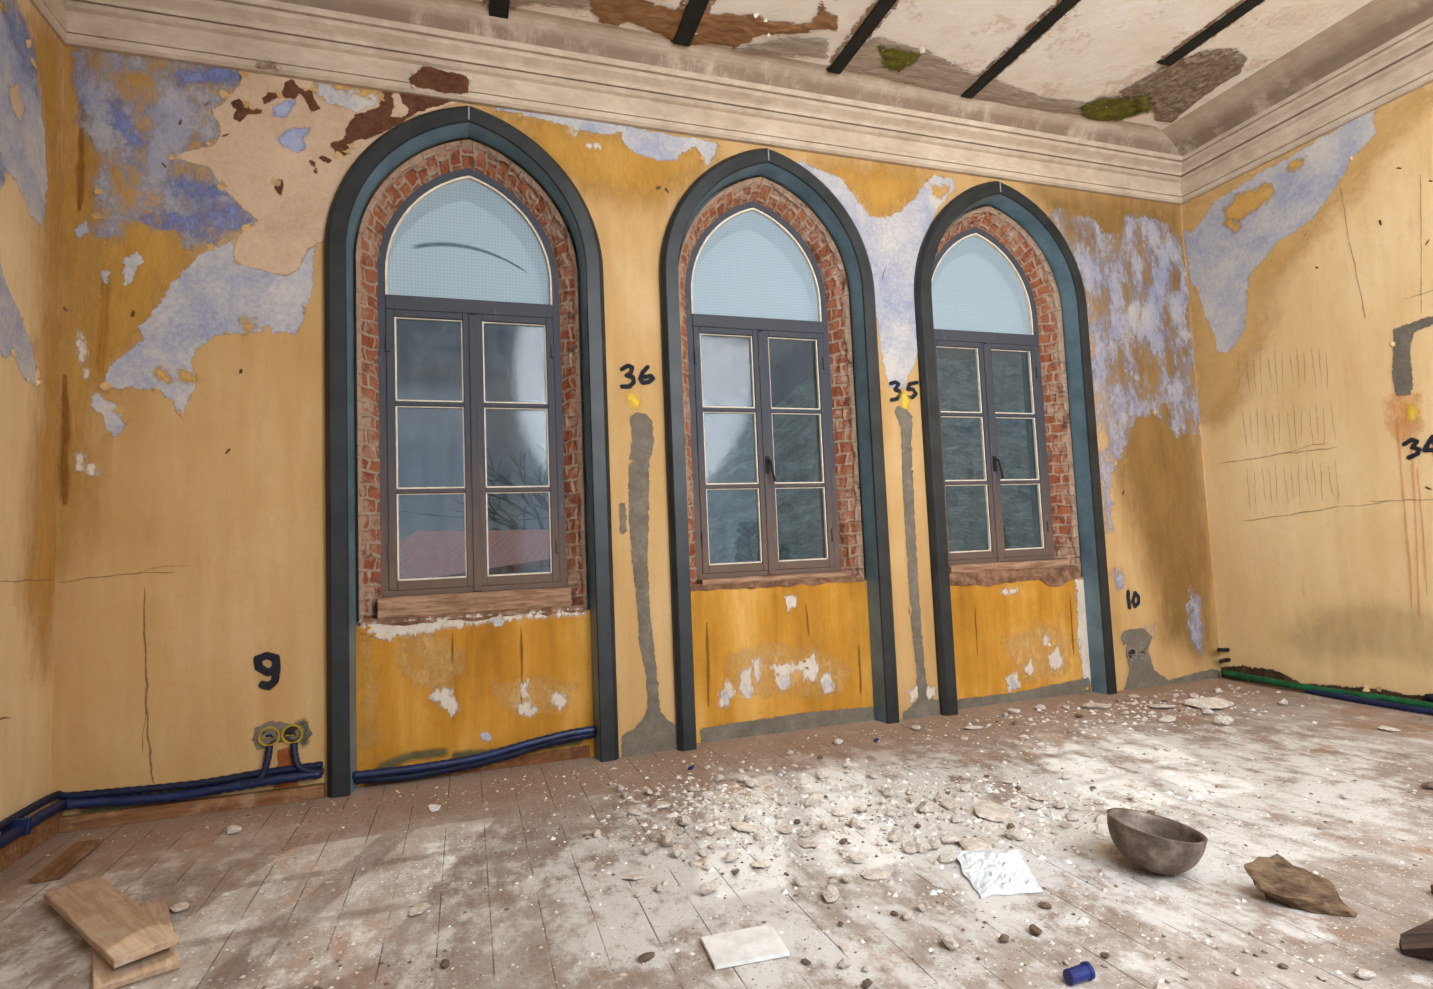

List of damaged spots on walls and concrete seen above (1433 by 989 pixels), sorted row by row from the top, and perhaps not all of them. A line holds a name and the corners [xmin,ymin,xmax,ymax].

peeling [0,0,48,225]
leakage [29,24,216,646]
flaking render [71,48,472,437]
peeling [495,108,721,166]
peeling [797,160,955,389]
flaking render [509,0,1264,123]
peeling [1051,110,1376,530]
crack [0,566,171,785]
peeling [429,654,460,717]
peeling [360,604,587,642]
peeling [717,653,834,707]
spalling [949,565,1091,693]